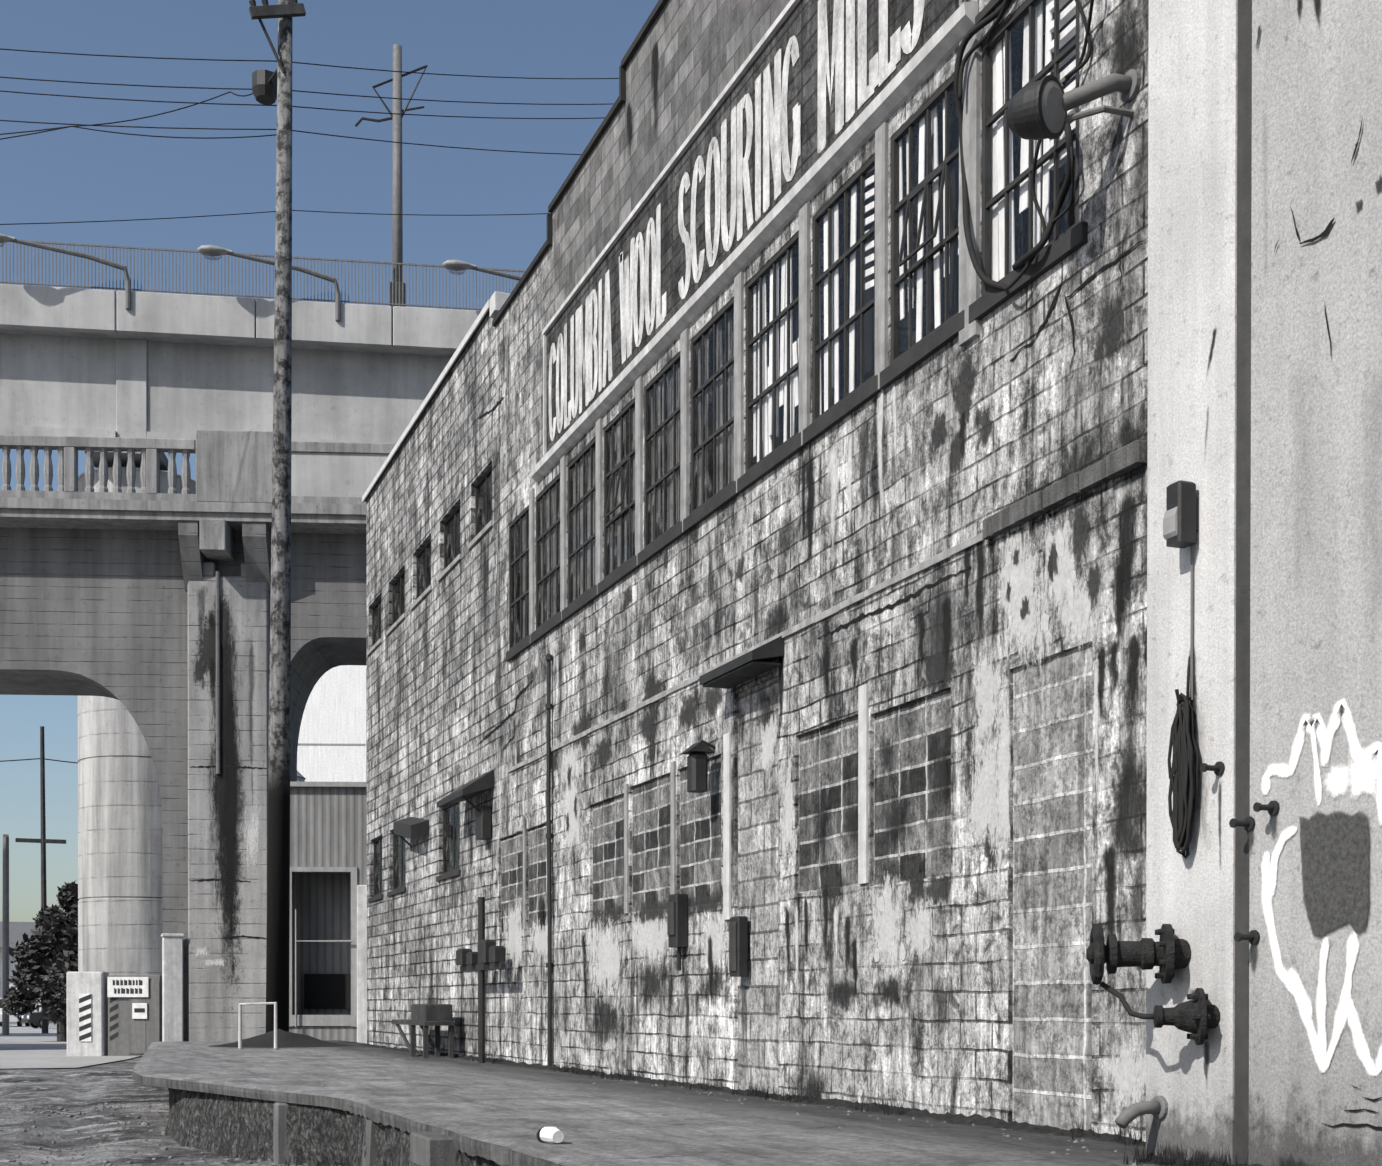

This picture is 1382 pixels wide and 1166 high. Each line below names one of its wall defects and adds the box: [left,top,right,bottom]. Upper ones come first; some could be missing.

damp [918,533,992,693]
damp [757,657,783,731]
damp [195,589,261,981]
damp [581,934,625,1043]
damp [639,963,673,1006]
damp [696,937,729,1020]
damp [785,887,857,1011]
damp [873,977,908,1013]
damp [935,986,946,1019]